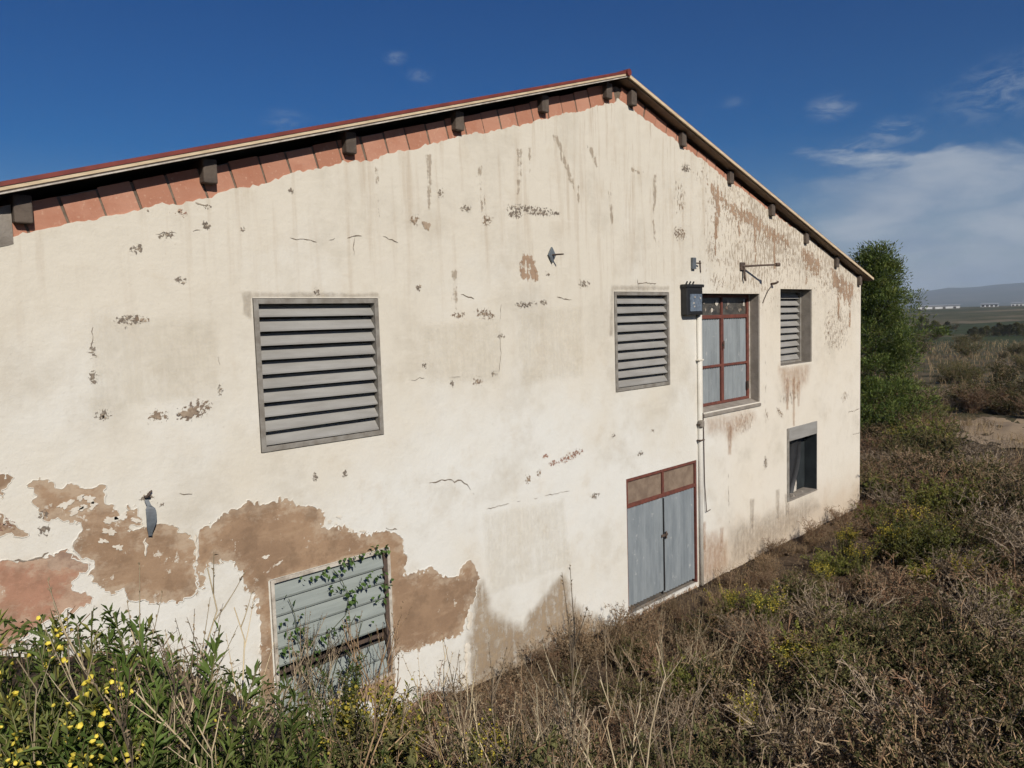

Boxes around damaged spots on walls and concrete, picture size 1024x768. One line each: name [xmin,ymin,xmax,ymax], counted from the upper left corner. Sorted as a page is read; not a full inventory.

spalling [507,204,559,219]
leakage [707,183,790,269]
spalling [113,315,149,329]
leakage [801,248,854,327]
spalling [148,384,222,421]
spalling [525,450,583,484]
flaking render [0,477,481,714]
leakage [471,581,603,685]